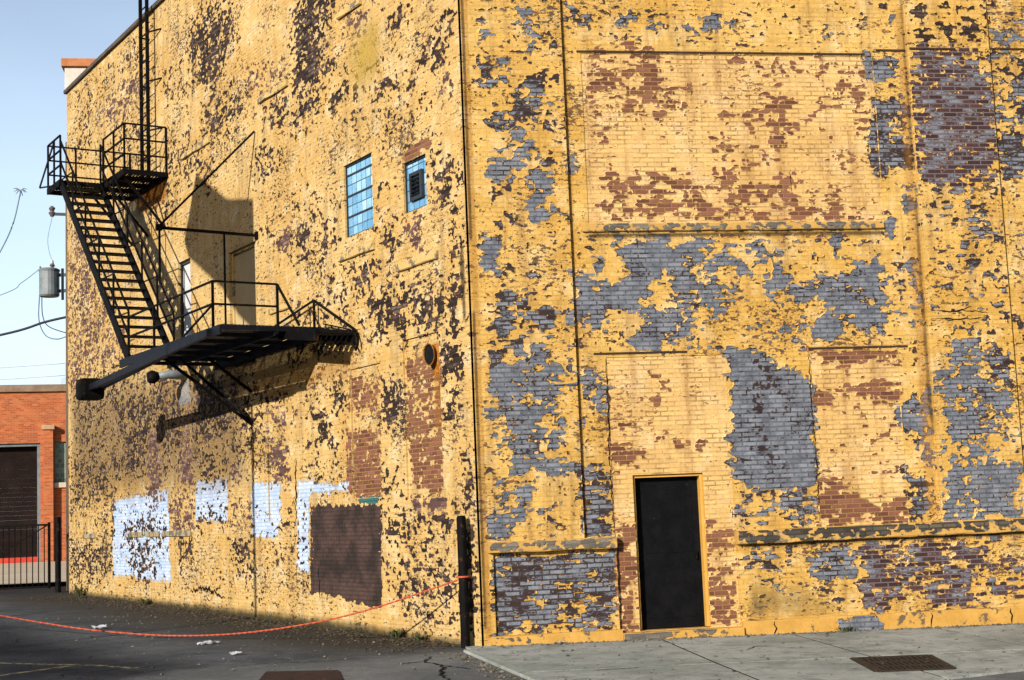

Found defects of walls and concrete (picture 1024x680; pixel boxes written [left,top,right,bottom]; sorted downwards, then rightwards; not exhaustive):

peeling [67,0,480,640]
peeling [466,0,1024,644]